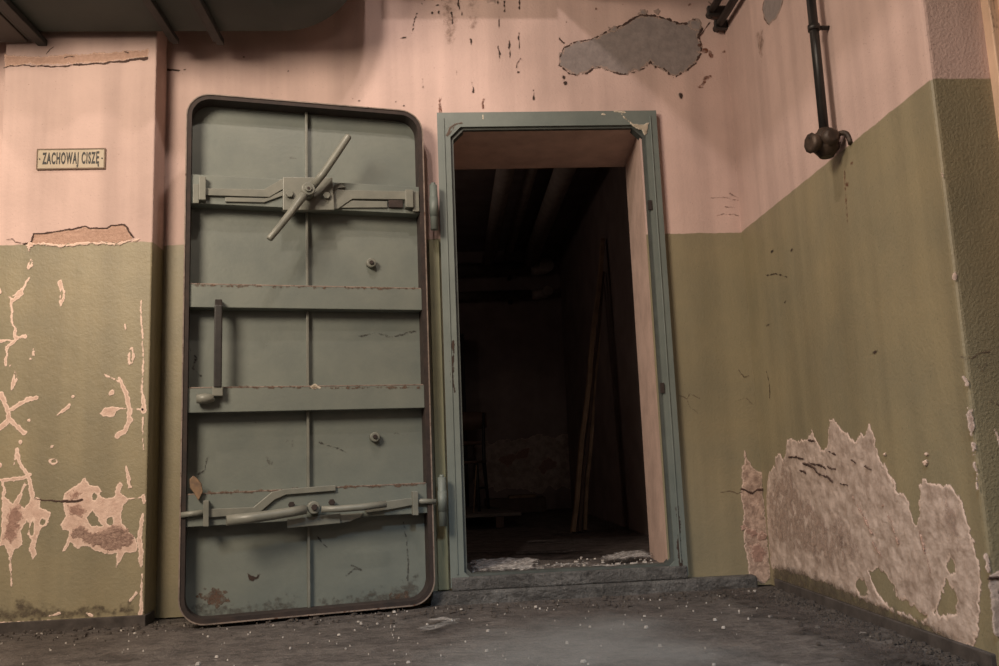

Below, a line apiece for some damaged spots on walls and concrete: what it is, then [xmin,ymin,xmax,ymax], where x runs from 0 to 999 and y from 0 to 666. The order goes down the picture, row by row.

crack [4,47,149,68]
flaking render [559,9,710,78]
flaking render [762,0,783,25]
peeling [0,224,146,615]
peeling [741,407,999,646]